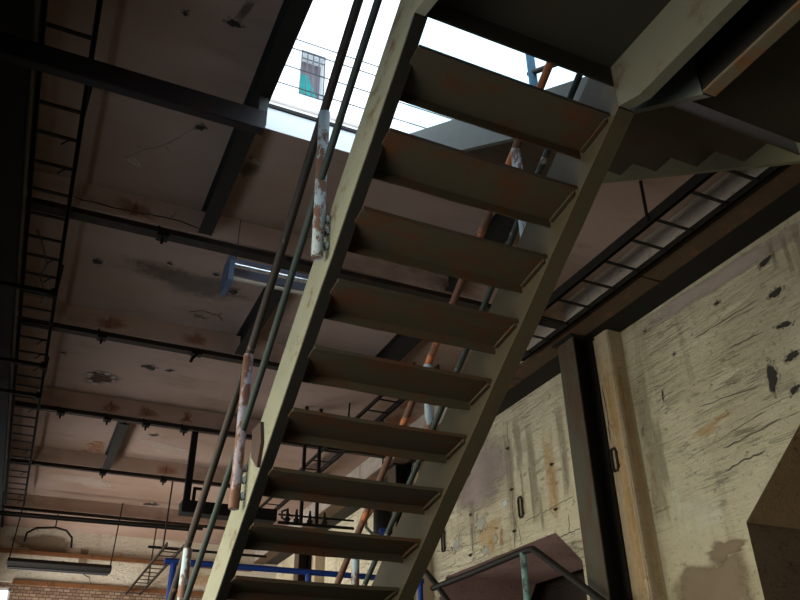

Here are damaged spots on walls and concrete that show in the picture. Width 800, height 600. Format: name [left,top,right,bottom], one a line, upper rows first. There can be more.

spalling [764,349,800,399]
damp [506,431,543,519]
damp [558,428,567,485]